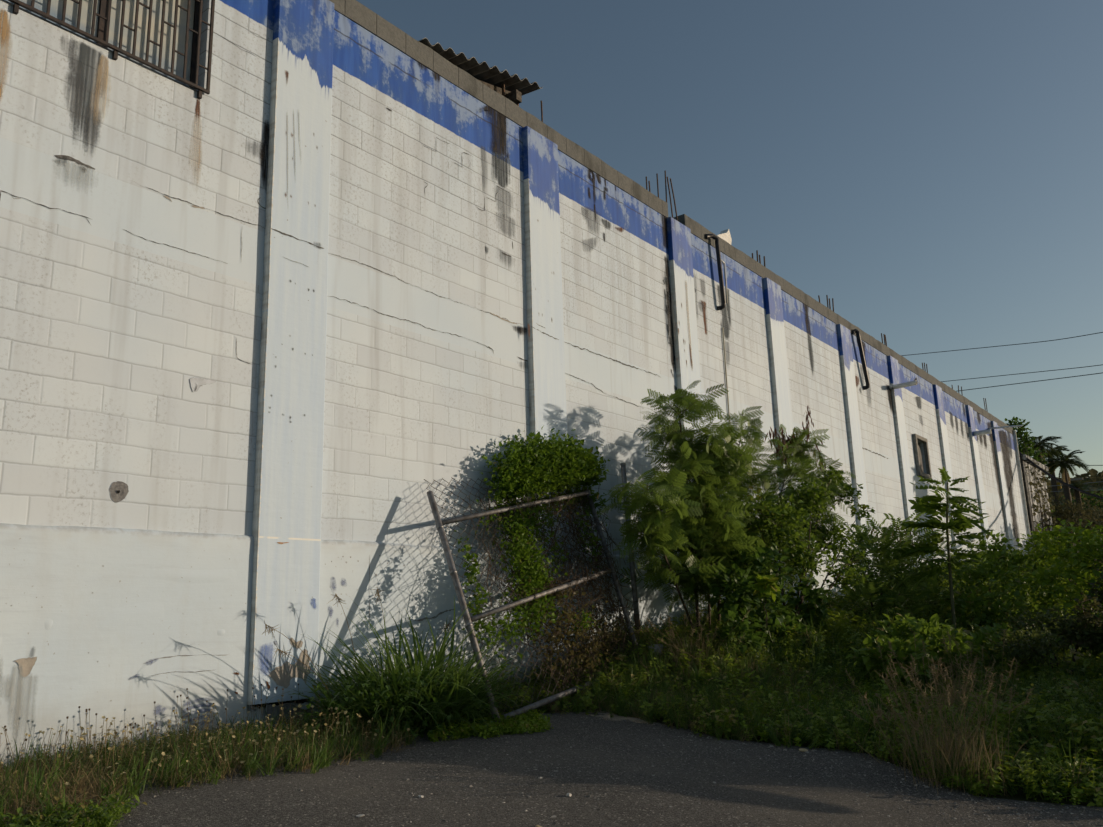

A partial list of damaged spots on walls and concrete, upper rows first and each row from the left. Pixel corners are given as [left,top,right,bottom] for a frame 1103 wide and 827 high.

water stain [71,42,101,138]
water stain [261,121,269,185]
water stain [480,105,510,187]
crack [0,191,91,225]
spalling [646,171,678,221]
crack [126,180,660,377]
water stain [662,215,677,401]
water stain [718,285,731,339]
spalling [109,481,129,503]
spalling [15,657,37,677]
peeling [247,637,312,721]